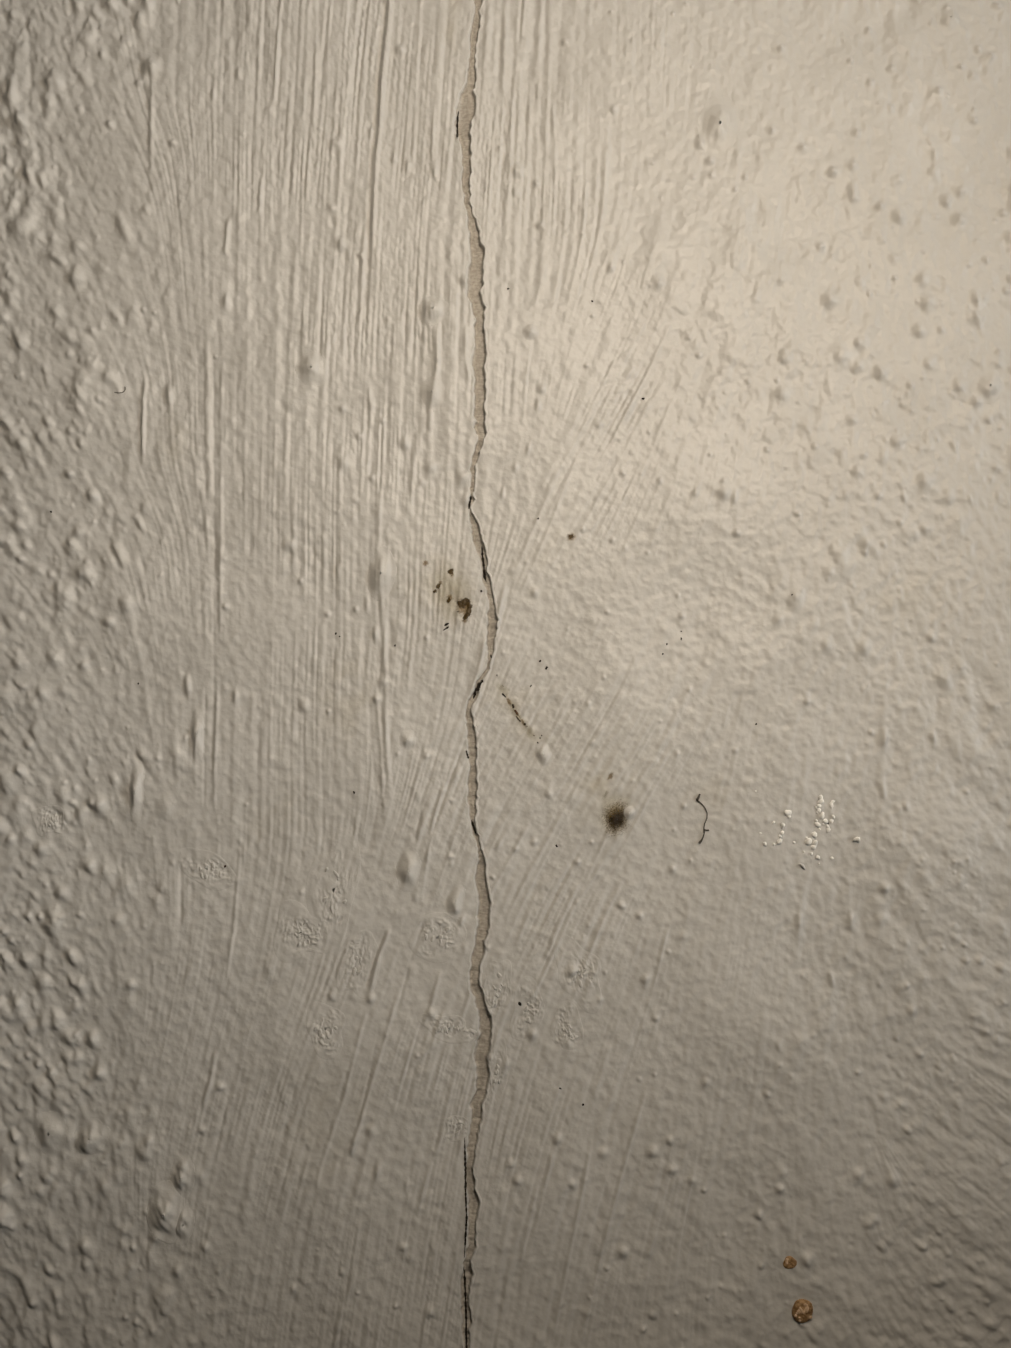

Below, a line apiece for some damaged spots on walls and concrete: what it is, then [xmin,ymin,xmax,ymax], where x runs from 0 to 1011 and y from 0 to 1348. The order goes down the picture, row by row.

rust [433,569,472,631]
crack [451,0,542,1348]